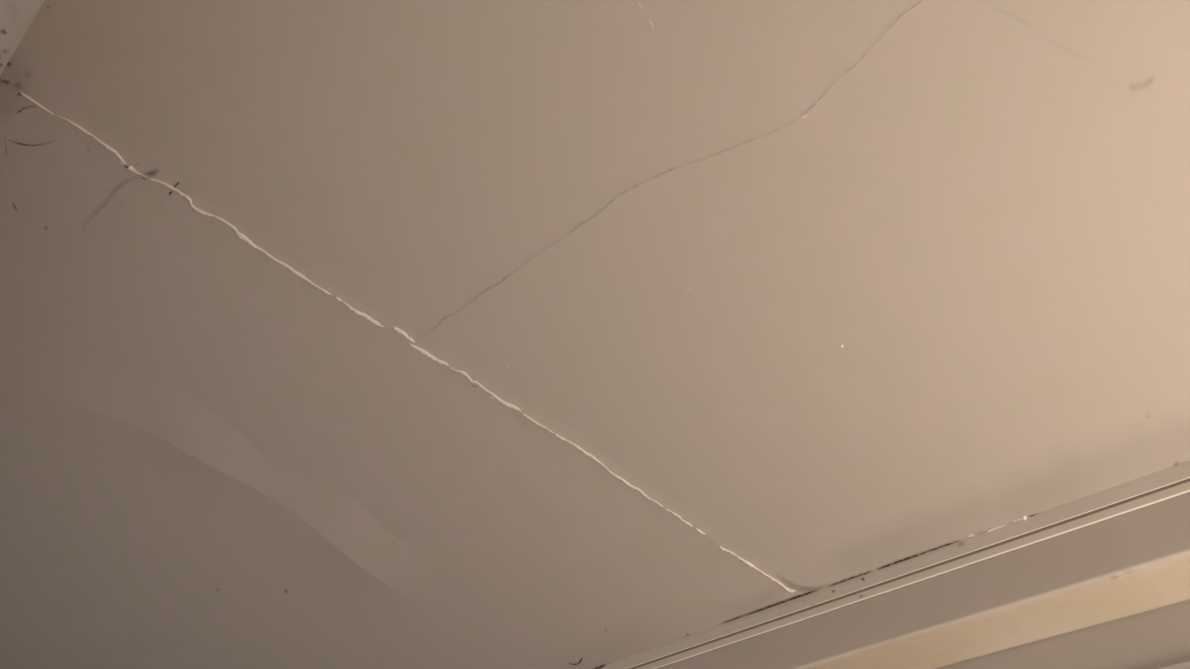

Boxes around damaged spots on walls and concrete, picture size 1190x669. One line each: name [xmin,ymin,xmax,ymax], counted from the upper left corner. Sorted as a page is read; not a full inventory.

crack [20,89,952,622]